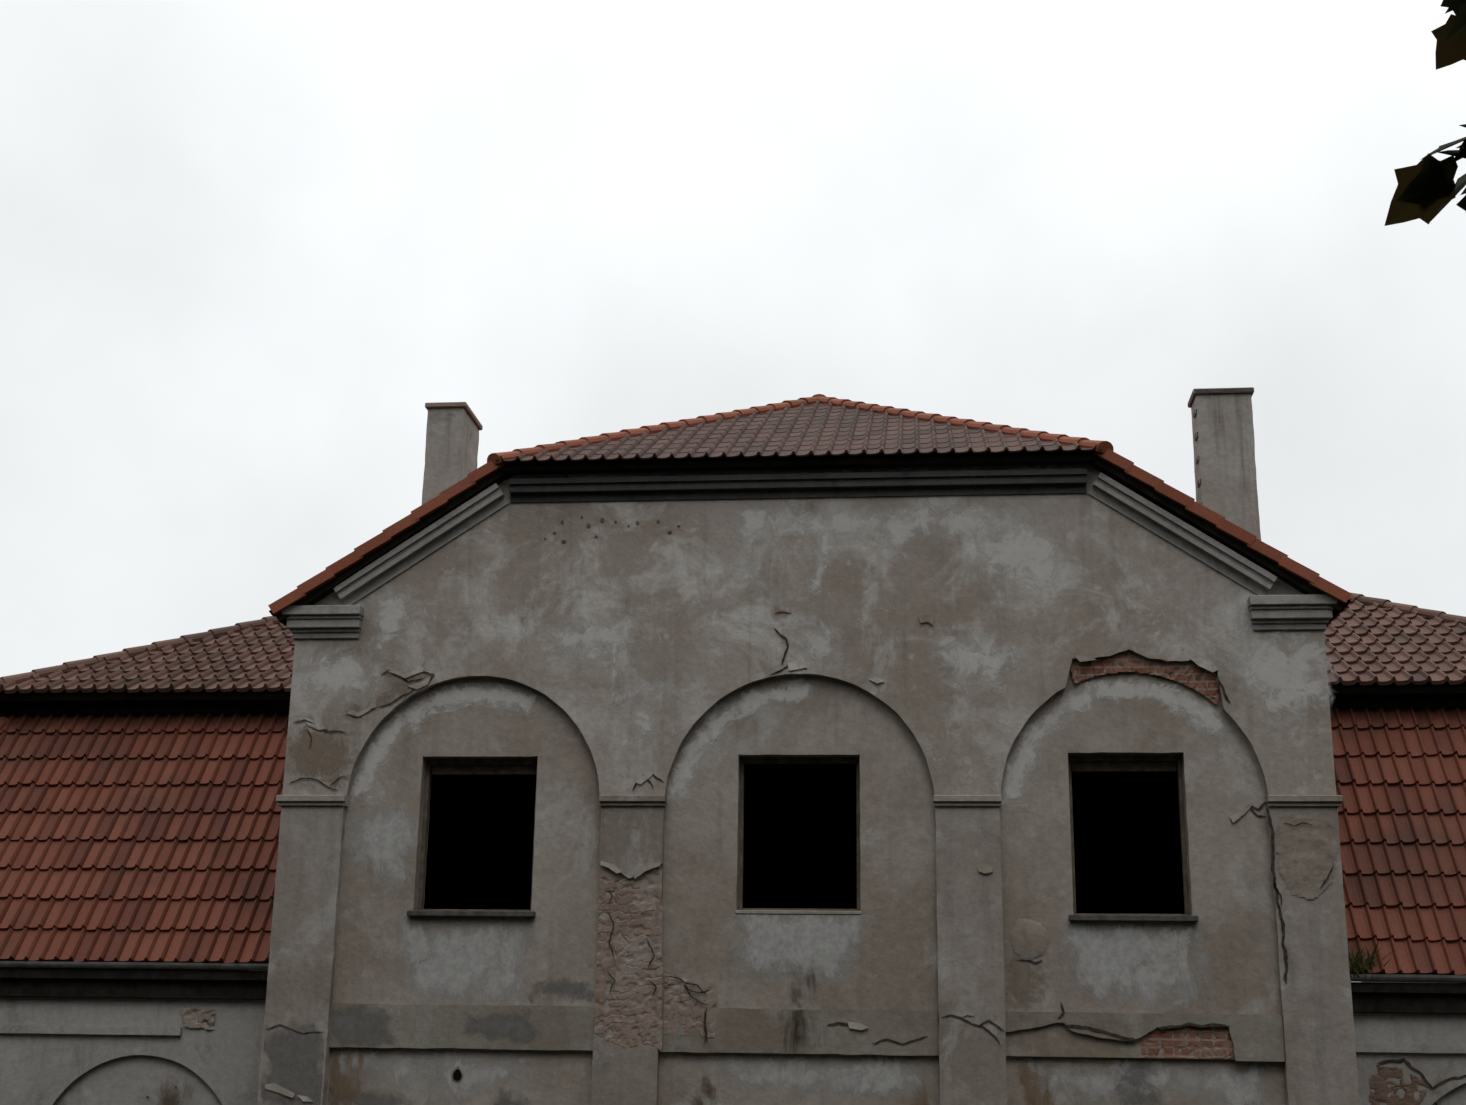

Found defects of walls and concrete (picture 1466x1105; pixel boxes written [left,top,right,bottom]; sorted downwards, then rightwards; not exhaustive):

crack [771,611,807,675]
flaking render [1071,650,1219,704]
flaking render [594,861,717,1051]
flaking render [1369,1058,1434,1105]
crack [1430,1075,1466,1105]